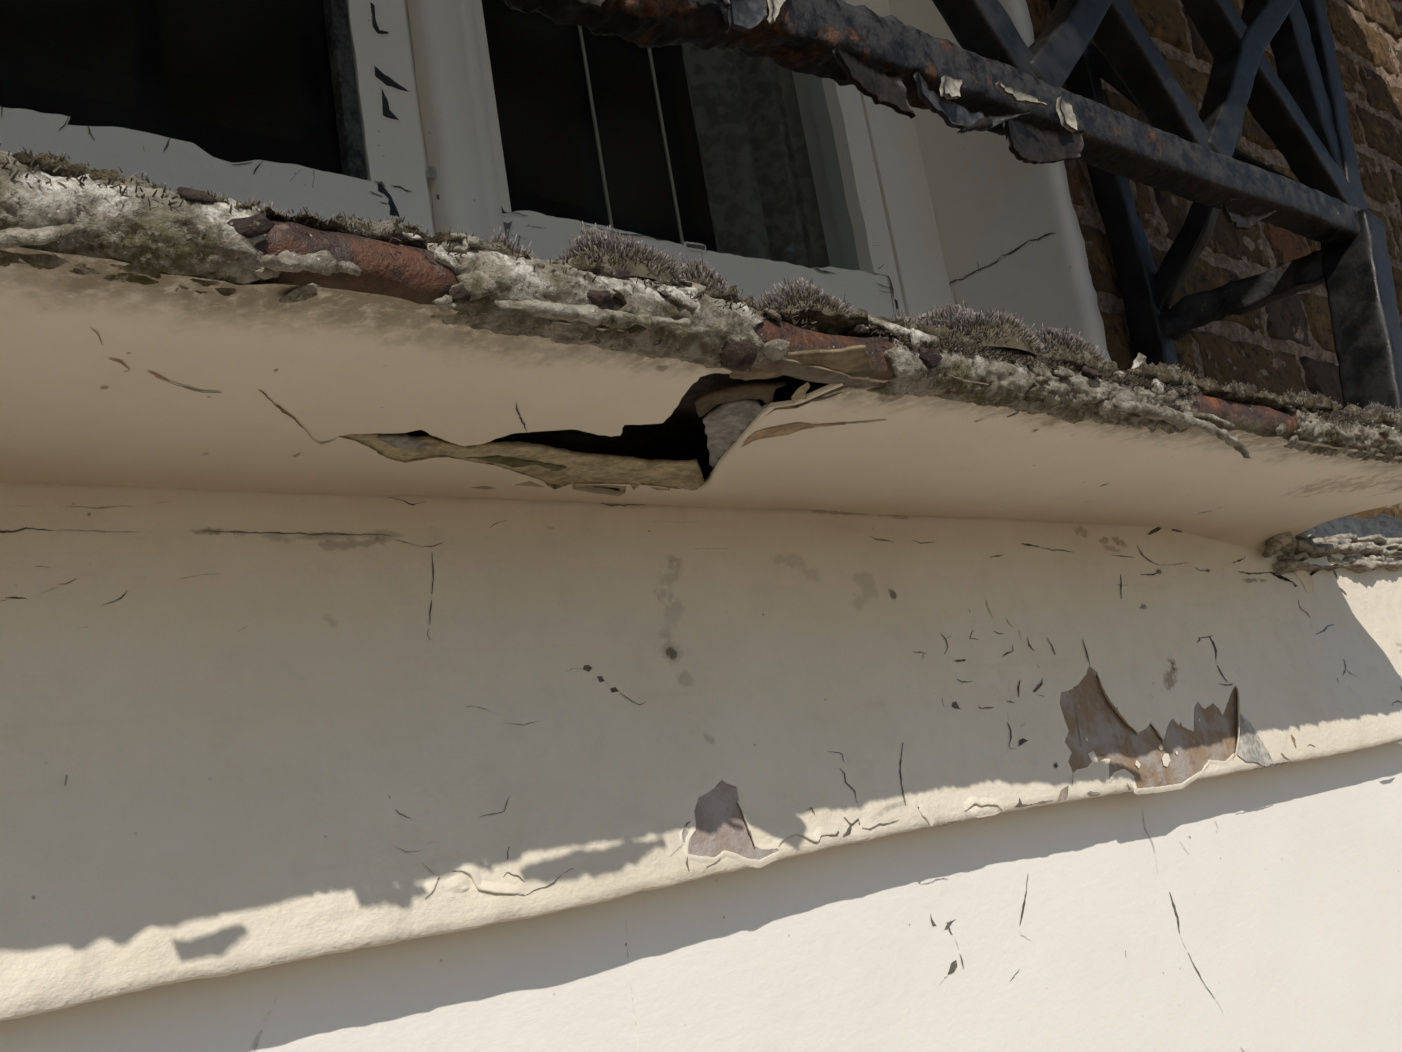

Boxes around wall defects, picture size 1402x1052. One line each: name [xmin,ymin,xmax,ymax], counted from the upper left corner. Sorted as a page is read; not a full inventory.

peeling [367,0,390,37]
peeling [371,64,412,123]
peeling [370,180,424,241]
crack [949,233,1055,305]
spalling [338,315,943,497]
crack [0,501,171,533]
crack [990,543,1071,558]
crack [1114,546,1347,635]
crack [1197,635,1234,686]
peeling [1015,641,1292,807]
peeling [671,774,783,870]
crack [1142,810,1223,1011]